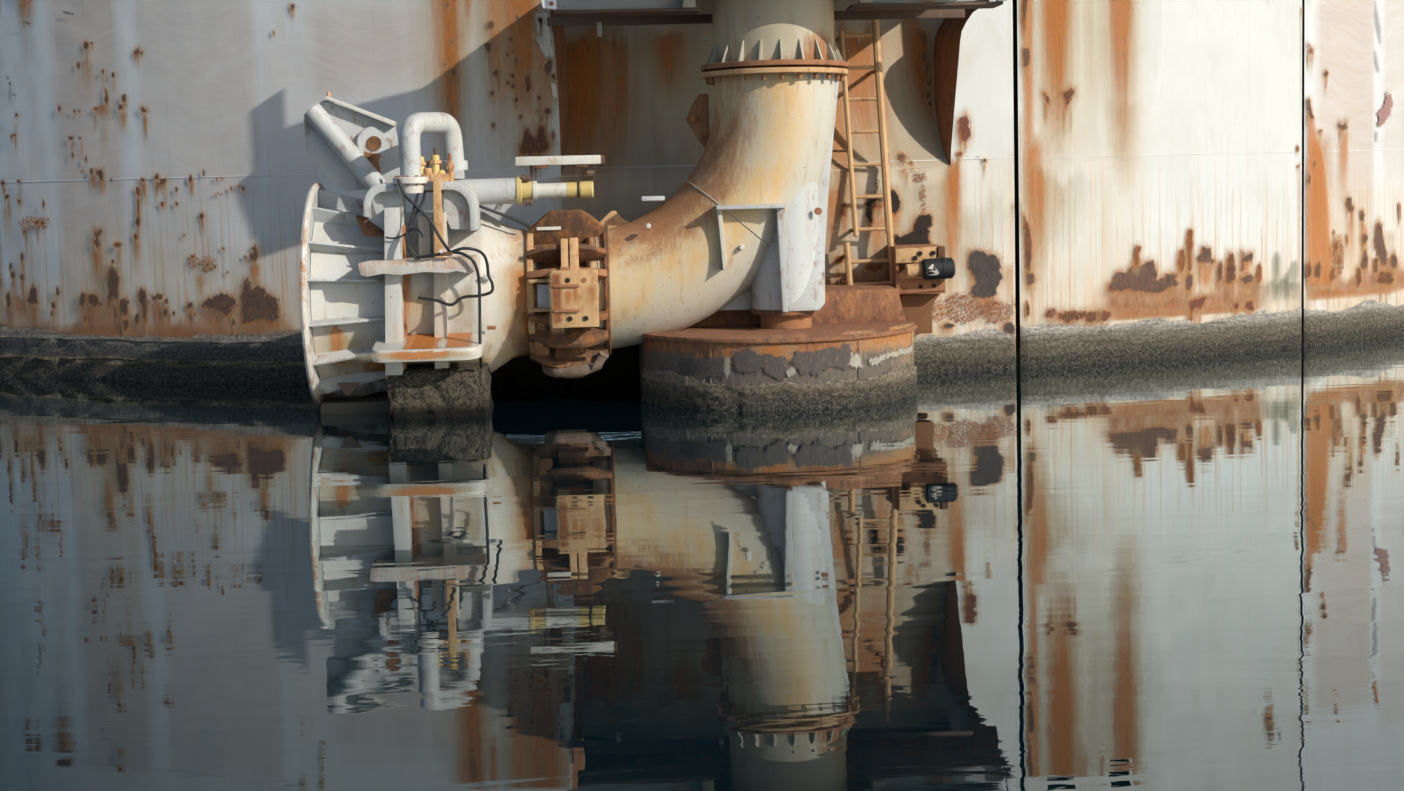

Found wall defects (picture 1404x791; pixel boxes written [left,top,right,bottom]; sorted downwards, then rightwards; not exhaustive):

corrosion [58,69,148,132]
corrosion [435,0,470,118]
corrosion [484,0,628,172]
corrosion [1111,0,1130,92]
corrosion [68,136,112,188]
corrosion [825,0,1067,337]
corrosion [1297,97,1404,299]
corrosion [0,170,280,338]
corrosion [507,259,594,336]
corrosion [760,326,910,354]
corrosion [1107,228,1262,318]